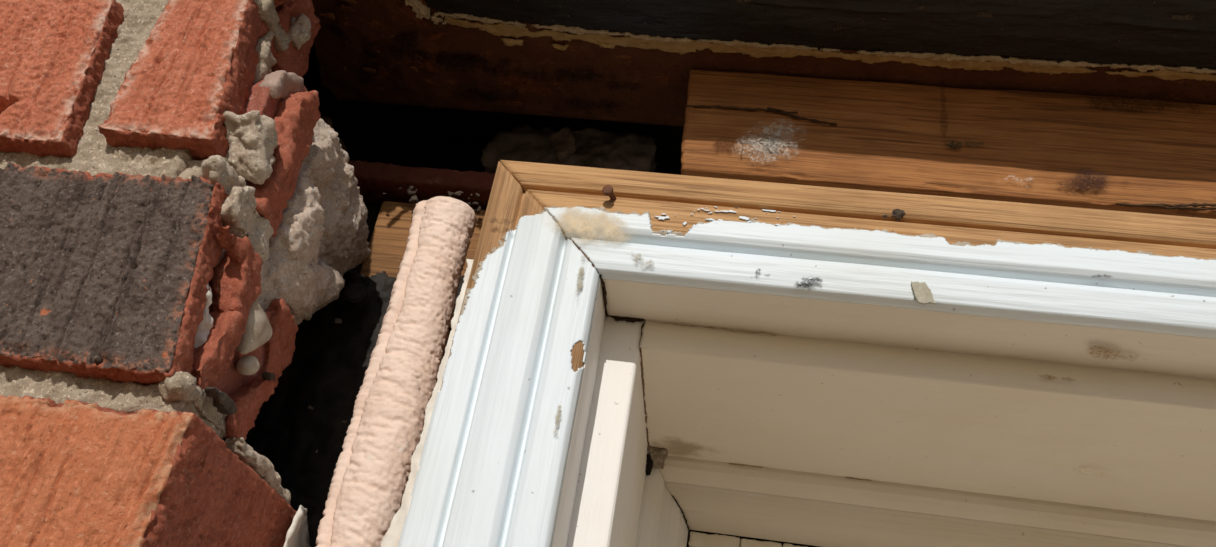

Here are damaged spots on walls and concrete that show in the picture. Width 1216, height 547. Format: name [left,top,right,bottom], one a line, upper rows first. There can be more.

spalling [40,0,371,505]
crack [686,104,837,126]
peeling [380,206,1216,547]